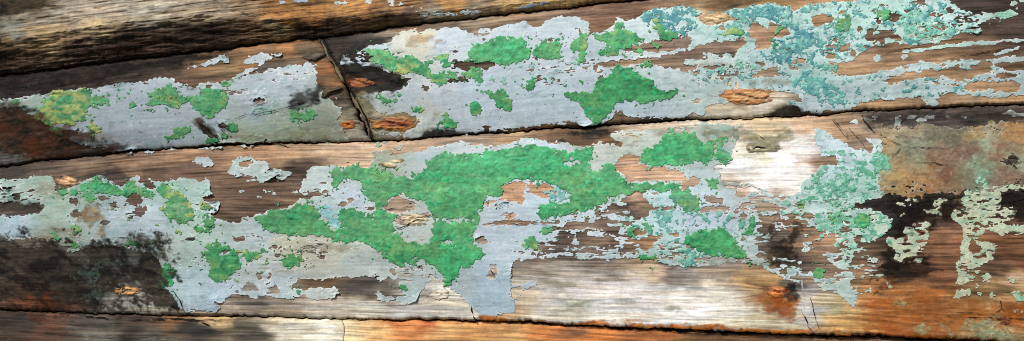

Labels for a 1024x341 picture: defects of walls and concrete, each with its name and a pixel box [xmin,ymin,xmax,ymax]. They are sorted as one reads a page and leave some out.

peeling [0,52,350,168]
crack [238,9,380,141]
peeling [340,0,1024,139]
peeling [0,110,1024,319]
leakage [857,196,961,287]
leakage [1003,193,1024,221]